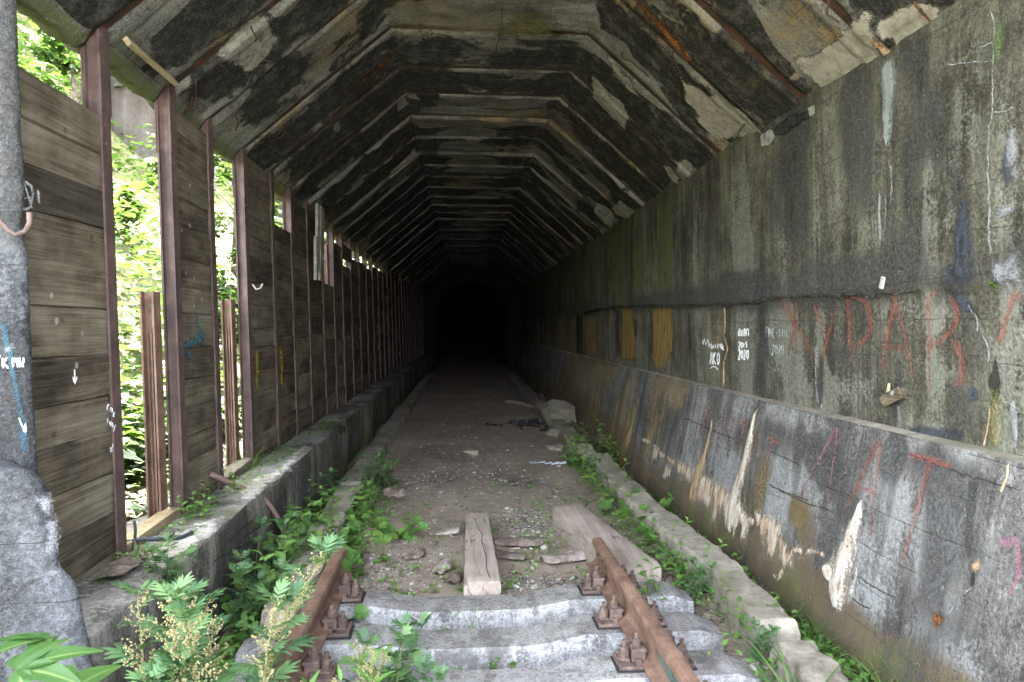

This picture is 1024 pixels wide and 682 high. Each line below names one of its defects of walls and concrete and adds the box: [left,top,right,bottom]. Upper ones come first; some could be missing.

corrosion [636,1,691,62]
spalling [795,0,939,88]
spalling [592,52,649,129]
damp [882,60,895,144]
spalling [593,200,634,227]
spalling [664,159,694,184]
damp [877,161,892,242]
damp [1002,147,1011,185]
damp [945,177,989,361]